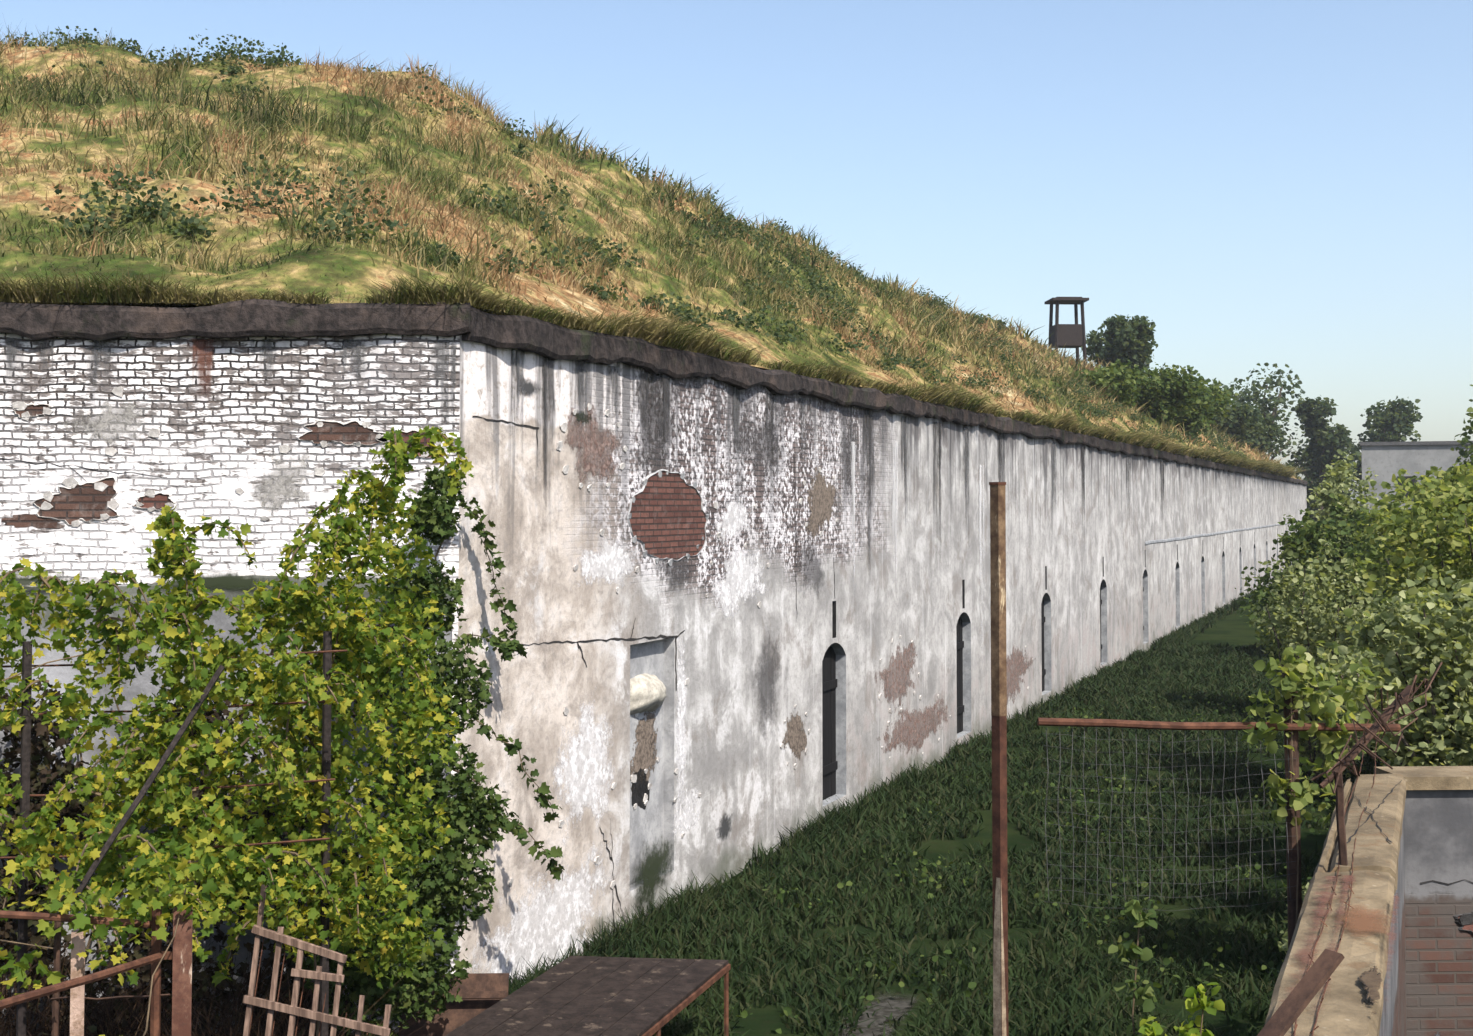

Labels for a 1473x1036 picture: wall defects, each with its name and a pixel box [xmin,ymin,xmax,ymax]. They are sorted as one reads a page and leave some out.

spalling [1,476,176,529]
spalling [235,420,444,521]
crack [473,416,539,462]
water stain [512,349,555,425]
water stain [637,371,673,467]
flaking render [573,469,771,616]
water stain [841,409,874,519]
water stain [892,416,909,535]
water stain [964,426,1006,558]
crack [522,618,685,691]
peeling [554,644,702,842]
flaking render [875,635,951,760]